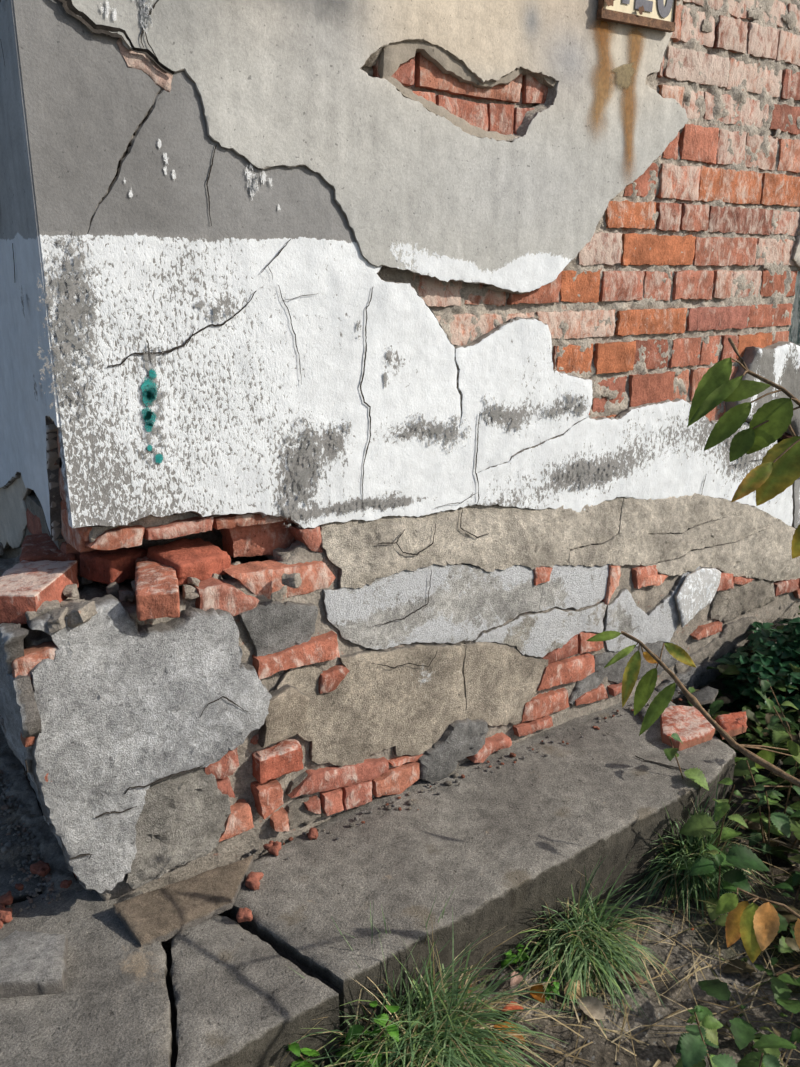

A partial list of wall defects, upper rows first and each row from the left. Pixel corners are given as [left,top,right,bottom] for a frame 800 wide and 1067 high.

spalling [360,40,424,77]
spalling [499,68,559,141]
corrosion [594,20,642,168]
crack [206,146,216,226]
crack [107,239,318,384]
crack [360,287,373,503]
peeling [394,413,471,453]
peeling [718,341,800,475]
crack [374,413,489,626]
peeling [674,567,721,628]
spalling [660,705,747,751]
crack [164,950,178,1067]